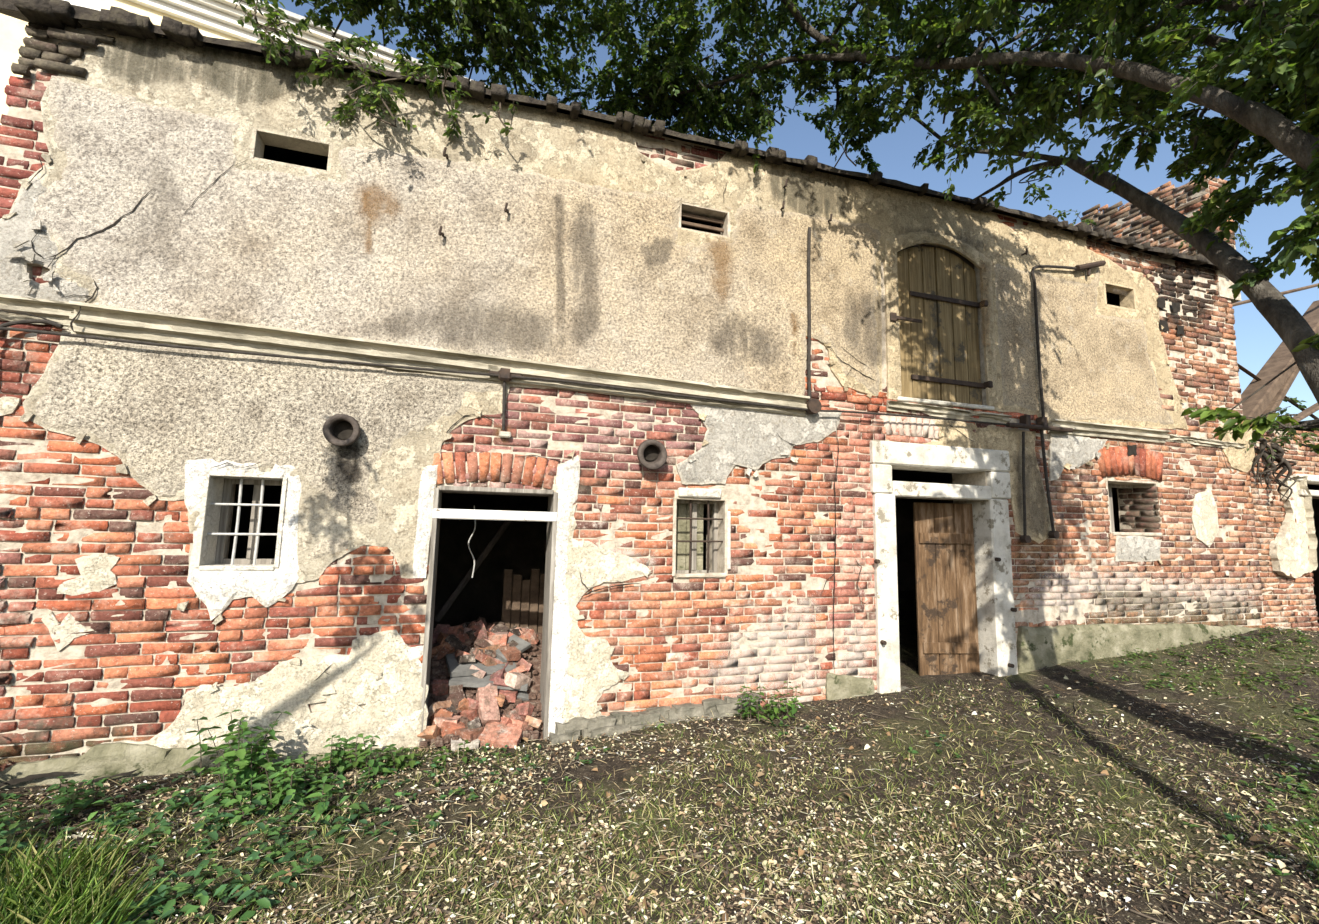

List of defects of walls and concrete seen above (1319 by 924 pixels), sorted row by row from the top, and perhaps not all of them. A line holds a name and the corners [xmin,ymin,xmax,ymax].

spalling [0,21,116,219]
crack [184,160,246,214]
spalling [22,252,55,284]
crack [0,279,98,332]
crack [31,188,154,268]
spalling [441,238,1319,723]
spalling [0,320,429,771]